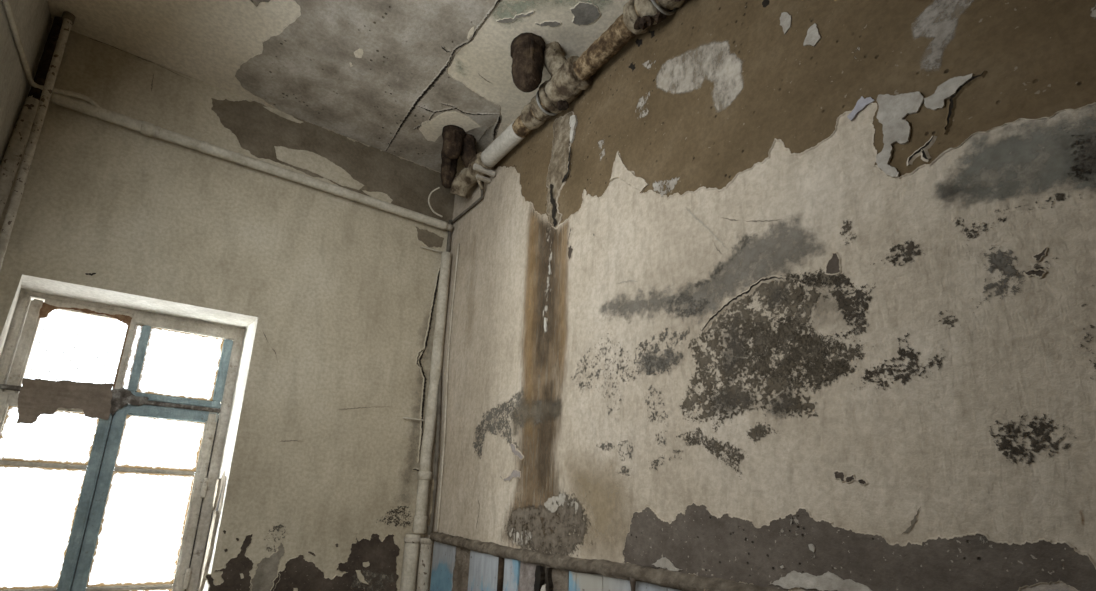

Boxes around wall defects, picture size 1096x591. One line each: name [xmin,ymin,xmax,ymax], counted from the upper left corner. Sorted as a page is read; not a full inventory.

peeling [211,0,601,224]
flaking render [414,226,444,248]
crack [384,0,502,152]
flaking render [493,0,1096,229]
damp [937,105,1096,239]
damp [977,247,1057,308]
crack [412,260,441,472]
damp [571,218,944,476]
damp [988,414,1077,466]
flaking render [197,471,254,591]
flaking render [270,533,400,591]
flaking render [622,502,1096,591]